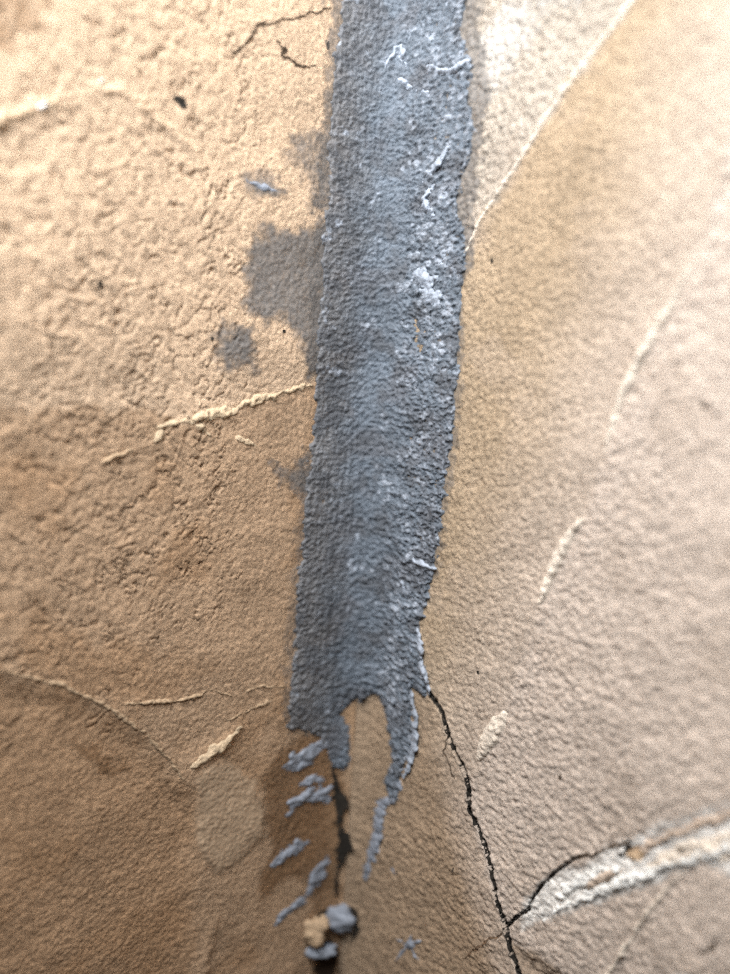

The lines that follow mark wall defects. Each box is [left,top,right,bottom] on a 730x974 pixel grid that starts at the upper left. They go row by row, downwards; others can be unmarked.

crack [325,765,361,942]
crack [425,687,573,974]
flaking render [522,805,730,930]